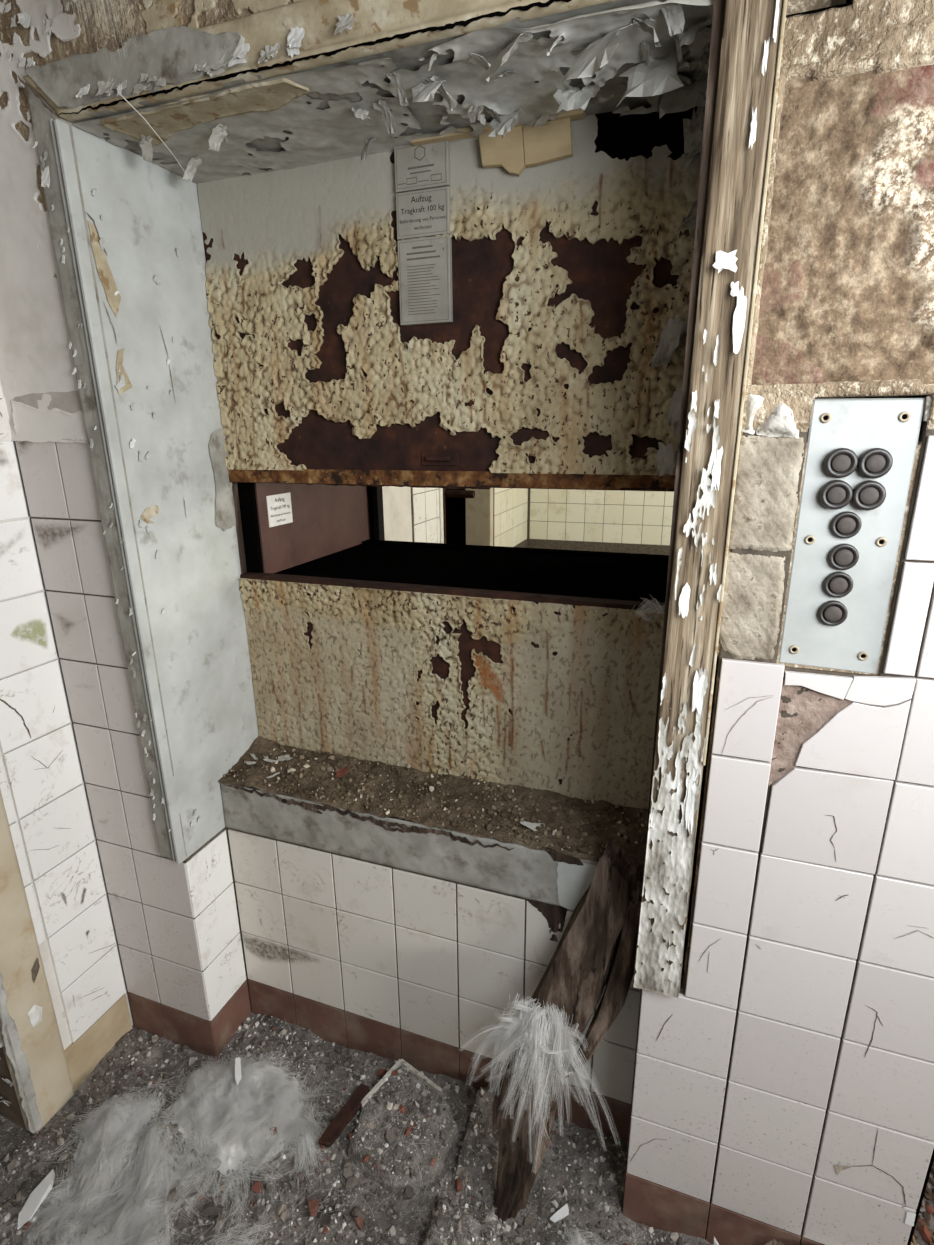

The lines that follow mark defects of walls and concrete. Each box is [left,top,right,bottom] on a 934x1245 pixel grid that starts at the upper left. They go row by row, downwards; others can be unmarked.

peeling [72,0,714,183]
peeling [762,0,780,76]
peeling [0,0,302,448]
corrosion [204,233,263,367]
corrosion [265,225,560,490]
corrosion [582,431,612,458]
corrosion [539,222,679,389]
flaking render [651,65,934,660]
corrosion [416,619,514,748]
spalling [768,680,854,785]
peeling [634,642,708,998]
crack [851,1129,906,1206]